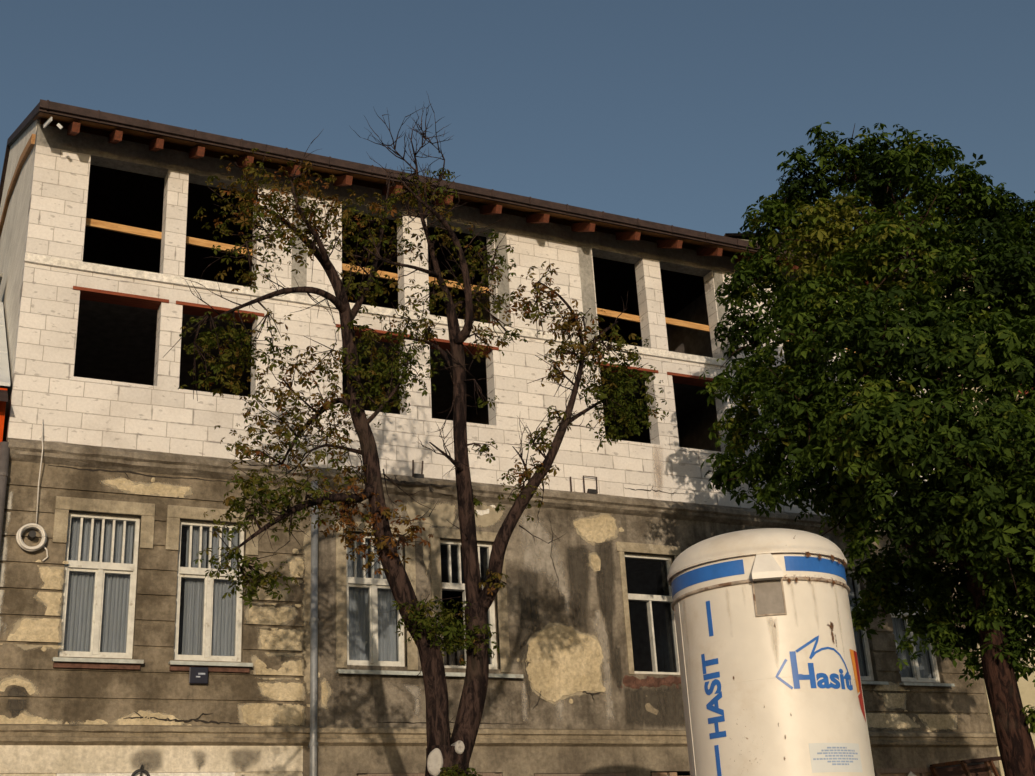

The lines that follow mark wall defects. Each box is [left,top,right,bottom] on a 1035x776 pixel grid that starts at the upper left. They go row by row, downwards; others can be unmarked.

peeling [101,477,192,498]
peeling [573,513,624,572]
peeling [238,530,332,726]
peeling [0,675,39,695]
peeling [517,623,623,705]
crack [123,711,241,724]